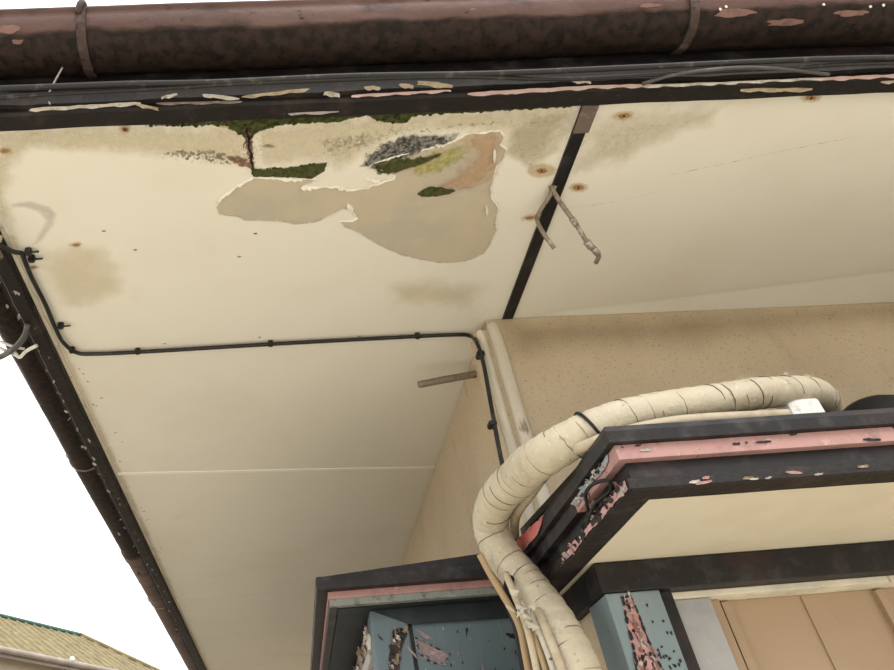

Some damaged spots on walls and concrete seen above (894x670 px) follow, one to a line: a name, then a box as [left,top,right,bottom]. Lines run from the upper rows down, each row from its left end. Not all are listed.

peeling [715,7,757,18]
peeling [0,24,24,44]
peeling [29,89,309,112]
peeling [351,81,453,98]
peeling [468,74,894,96]
water stain [362,135,456,169]
peeling [215,129,508,263]
peeling [562,454,628,564]
peeling [516,515,544,551]
peeling [353,624,464,670]
peeling [620,591,682,670]